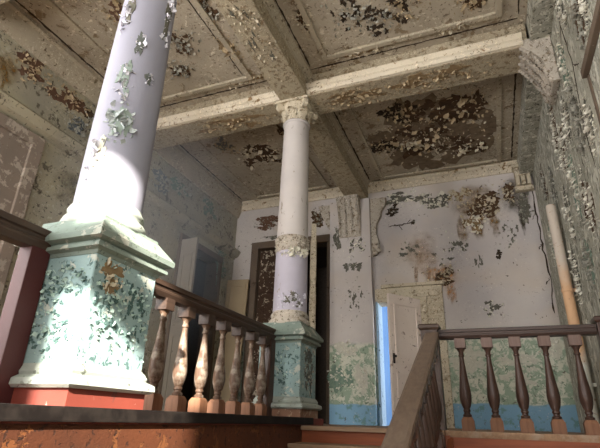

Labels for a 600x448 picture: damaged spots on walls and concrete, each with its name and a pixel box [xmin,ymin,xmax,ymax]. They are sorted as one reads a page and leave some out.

peeling [134,31,147,55]
peeling [159,0,202,83]
peeling [320,0,431,39]
peeling [9,51,137,181]
peeling [317,62,505,174]
crack [505,73,517,161]
peeling [537,0,600,307]
peeling [254,215,278,240]
peeling [385,180,535,286]
crack [532,191,555,313]
peeling [28,262,89,363]
peeling [87,257,155,350]